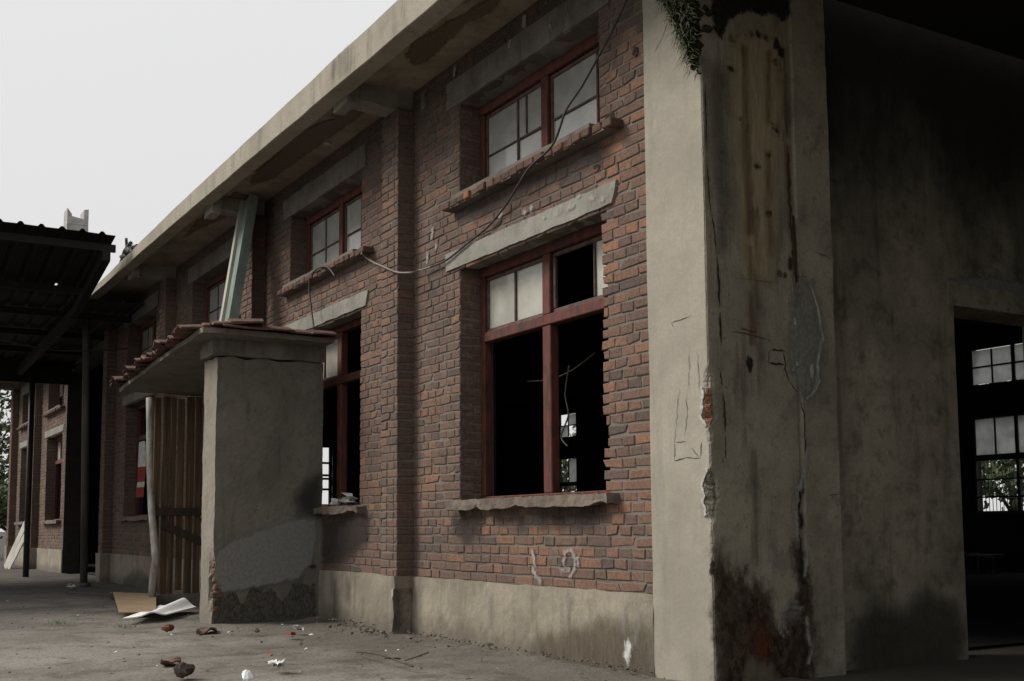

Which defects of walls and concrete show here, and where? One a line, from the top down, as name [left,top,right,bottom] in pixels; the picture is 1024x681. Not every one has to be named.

peeling [405,0,500,66]
leakage [712,0,791,86]
crack [705,85,810,584]
crack [674,348,726,458]
spalling [699,387,713,428]
spalling [701,468,715,518]
flaking render [210,558,316,624]
leakage [709,543,816,681]